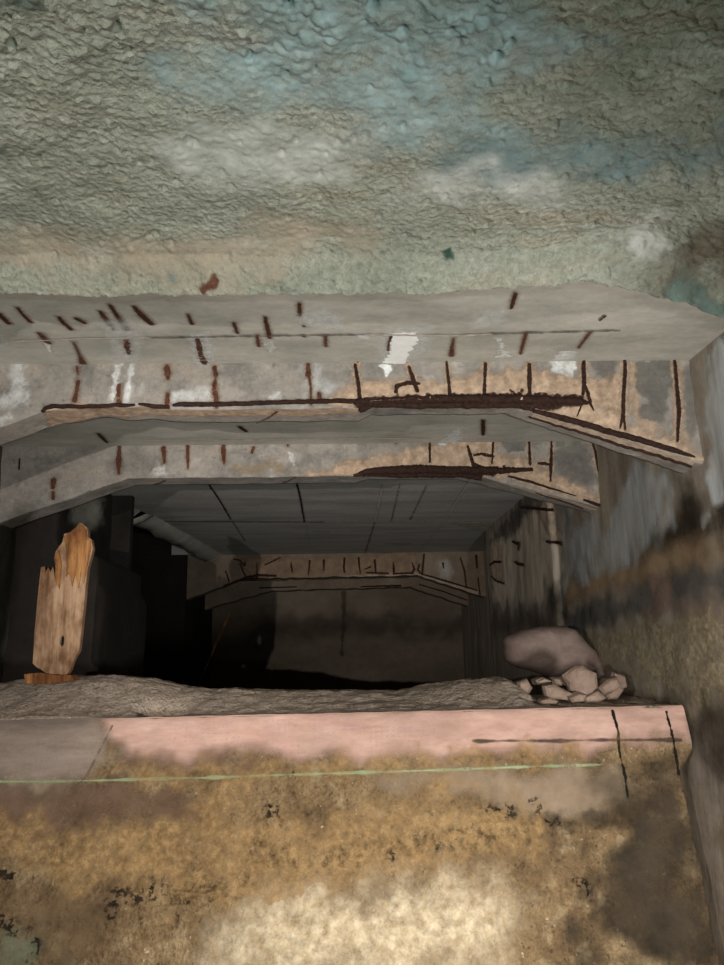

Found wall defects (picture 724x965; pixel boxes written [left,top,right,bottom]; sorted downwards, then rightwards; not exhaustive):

water stain [225,0,547,143]
water stain [666,229,724,317]
rust [99,305,132,355]
rust [133,306,155,325]
rust [195,338,218,408]
rust [305,363,321,405]
water stain [378,332,419,377]
rust [355,388,584,411]
spalling [41,360,704,545]
water stain [0,339,724,965]
crack [611,710,629,798]
crack [665,711,680,776]